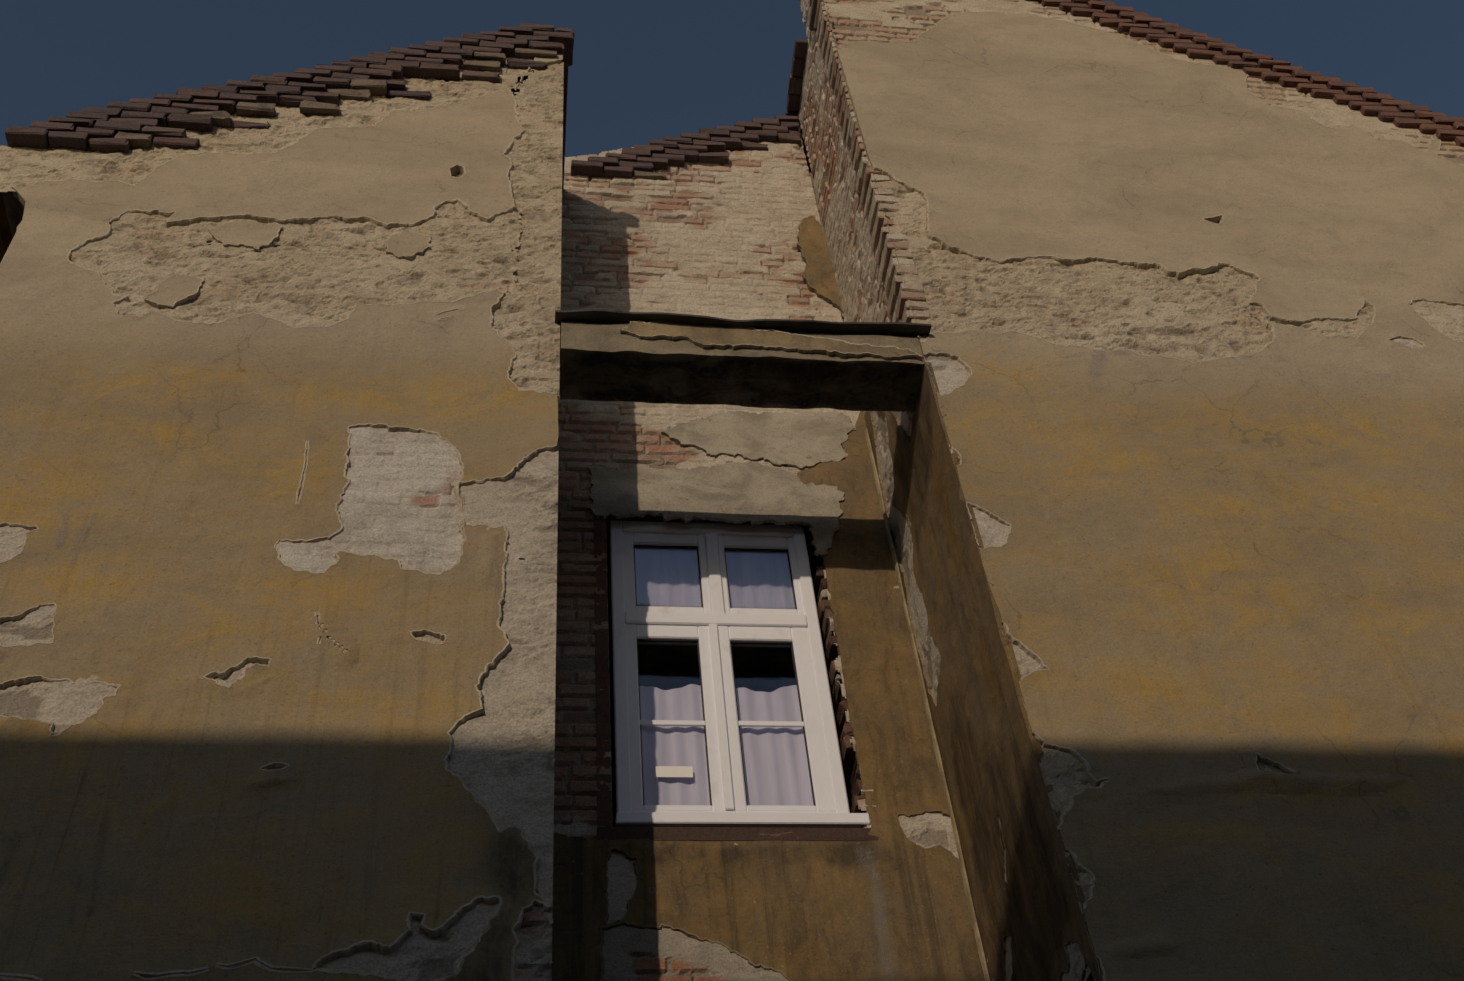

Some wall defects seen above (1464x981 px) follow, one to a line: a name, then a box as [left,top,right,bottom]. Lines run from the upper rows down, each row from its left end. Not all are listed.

spalling [823,0,1230,68]
spalling [1245,74,1464,166]
spalling [0,48,564,399]
spalling [620,164,1377,396]
peeling [0,522,39,563]
peeling [661,411,941,707]
peeling [0,603,57,647]
peeling [0,675,122,736]
spalling [272,423,559,981]
spalling [1033,733,1111,830]
peeling [897,810,960,863]
spalling [599,847,791,981]